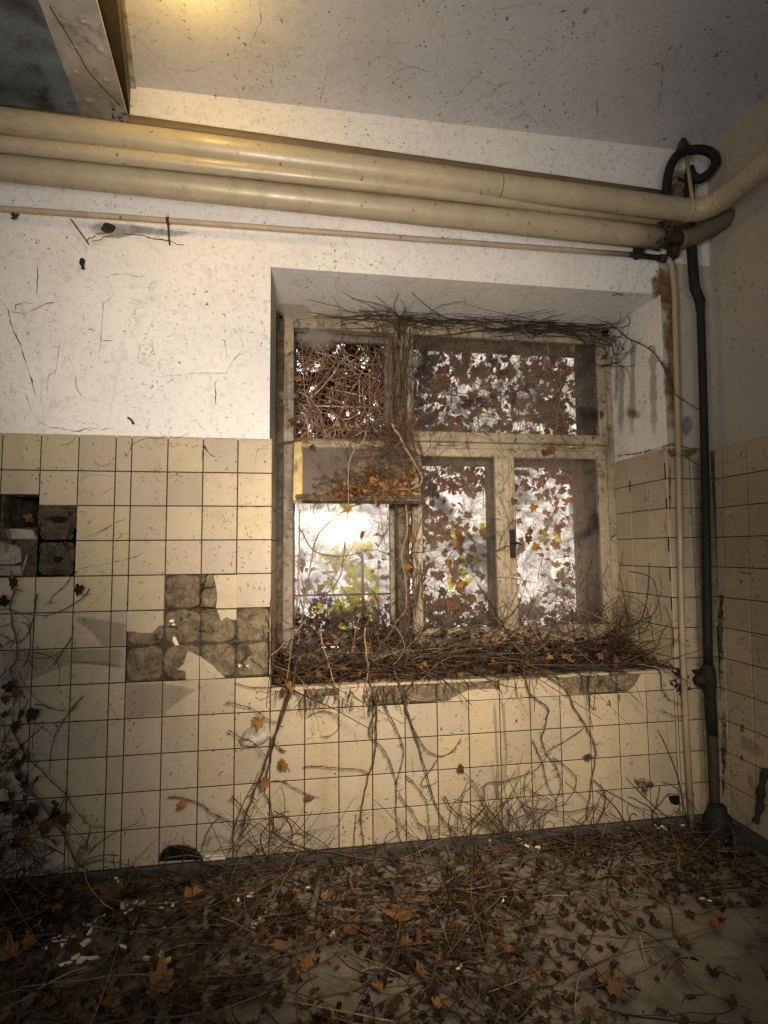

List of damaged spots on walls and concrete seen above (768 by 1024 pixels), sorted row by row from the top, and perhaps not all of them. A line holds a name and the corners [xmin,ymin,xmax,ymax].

crack [1,268,109,432]
crack [94,274,144,353]
crack [147,331,243,422]
spalling [0,506,77,577]
spalling [126,574,271,682]